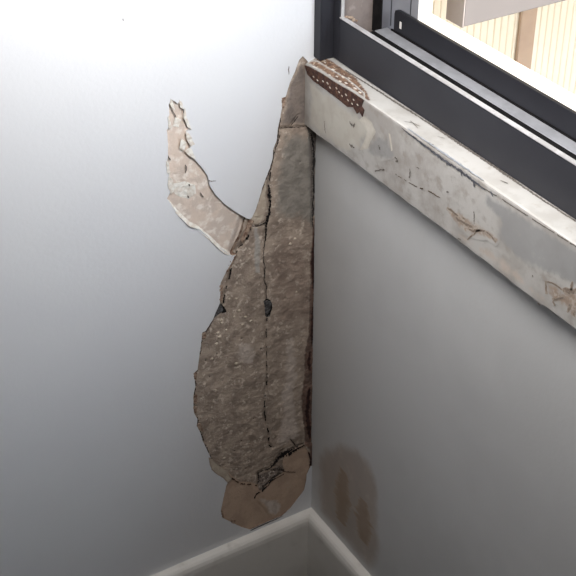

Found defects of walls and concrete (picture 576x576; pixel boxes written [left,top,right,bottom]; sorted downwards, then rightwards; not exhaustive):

rust [307,58,372,101]
crack [236,118,316,298]
spalling [166,57,398,531]
crack [254,318,304,499]
leakage [315,435,385,576]